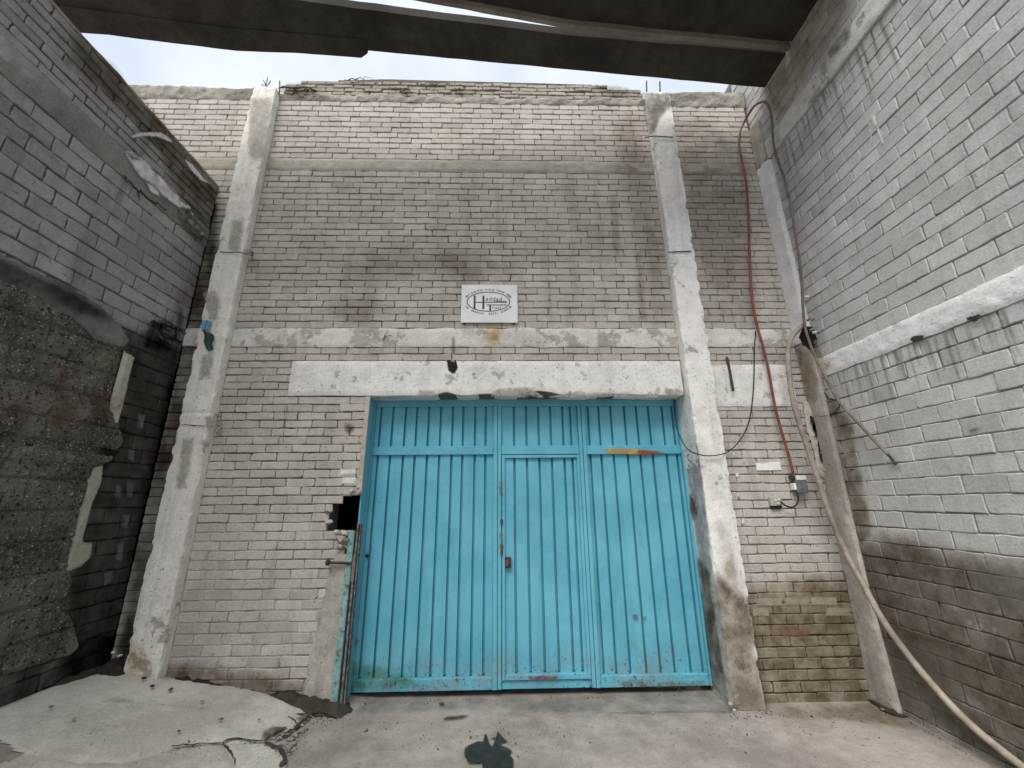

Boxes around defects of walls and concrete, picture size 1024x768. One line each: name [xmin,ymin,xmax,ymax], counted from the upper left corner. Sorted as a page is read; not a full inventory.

peeling [126,151,206,242]
spalling [447,350,458,373]
spalling [0,252,134,676]
spalling [325,510,354,549]
leakage [698,562,722,684]
leakage [760,596,850,702]
leakage [861,544,1024,760]
crack [171,711,347,766]